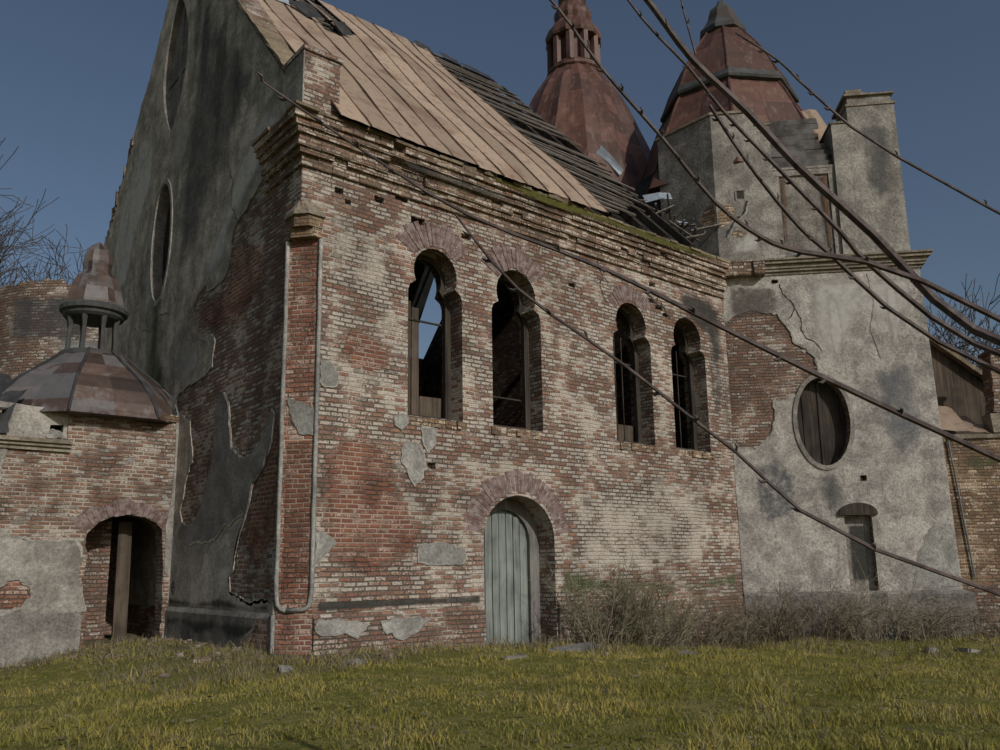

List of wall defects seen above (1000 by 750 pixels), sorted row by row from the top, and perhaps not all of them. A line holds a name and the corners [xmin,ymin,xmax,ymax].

water stain [207,111,281,273]
crack [725,201,751,238]
flaking render [160,167,468,653]
flaking render [724,282,819,450]
crack [779,284,822,351]
flaking render [0,449,168,558]
flaking render [0,578,34,613]